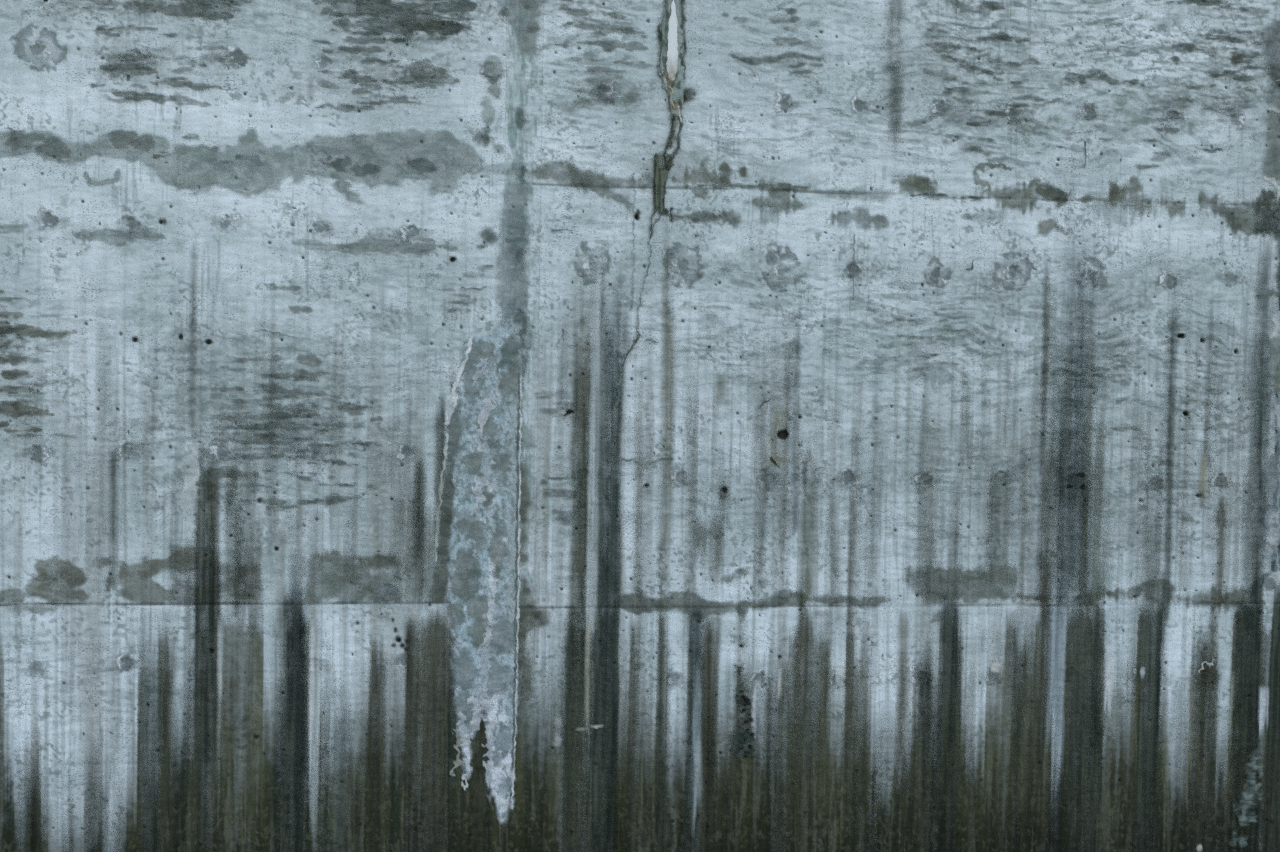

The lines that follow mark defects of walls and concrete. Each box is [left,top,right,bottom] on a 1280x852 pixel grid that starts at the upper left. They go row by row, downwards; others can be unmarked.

leakage [501,0,542,55]
leakage [516,109,525,128]
crack [616,0,694,408]
crack [619,456,673,465]